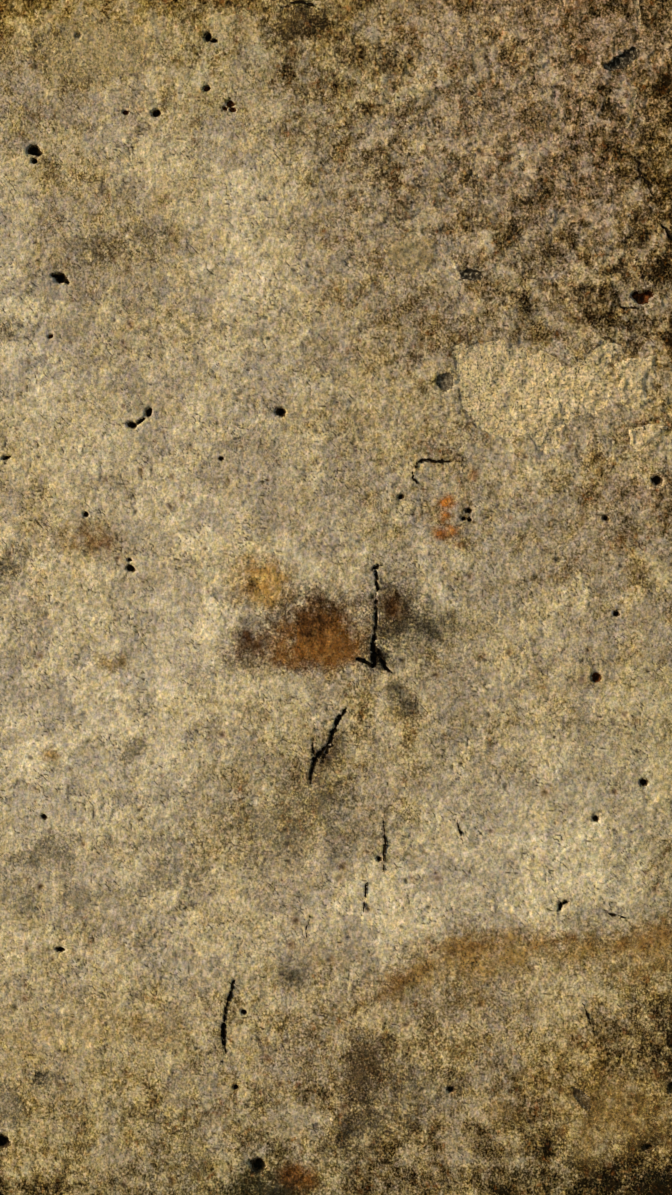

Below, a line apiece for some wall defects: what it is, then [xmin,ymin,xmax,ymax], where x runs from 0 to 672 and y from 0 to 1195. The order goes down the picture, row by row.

rust [434,495,460,546]
rust [227,555,415,672]
crack [355,564,393,673]
crack [309,707,347,784]
rust [366,917,672,1000]
crack [221,980,235,1063]
water stain [227,1172,291,1195]